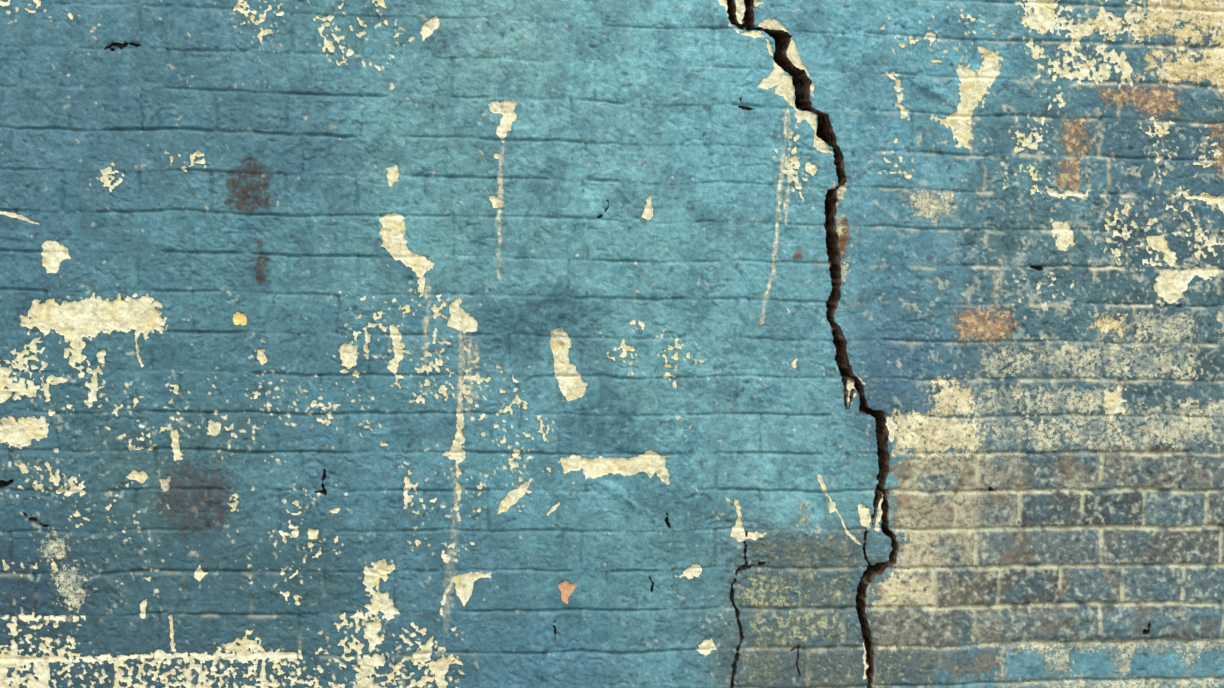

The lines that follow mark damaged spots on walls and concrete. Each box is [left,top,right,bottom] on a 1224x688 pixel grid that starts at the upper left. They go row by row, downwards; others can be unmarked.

flaking render [1014,0,1224,200]
peeling [379,212,435,297]
peeling [1051,220,1076,251]
peeling [1170,189,1224,214]
peeling [0,360,49,449]
peeling [20,293,168,407]
peeling [171,430,183,461]
peeling [549,327,588,401]
peeling [560,450,670,484]
crack [727,0,899,688]
flaking render [696,235,1224,688]
peeling [0,512,403,688]